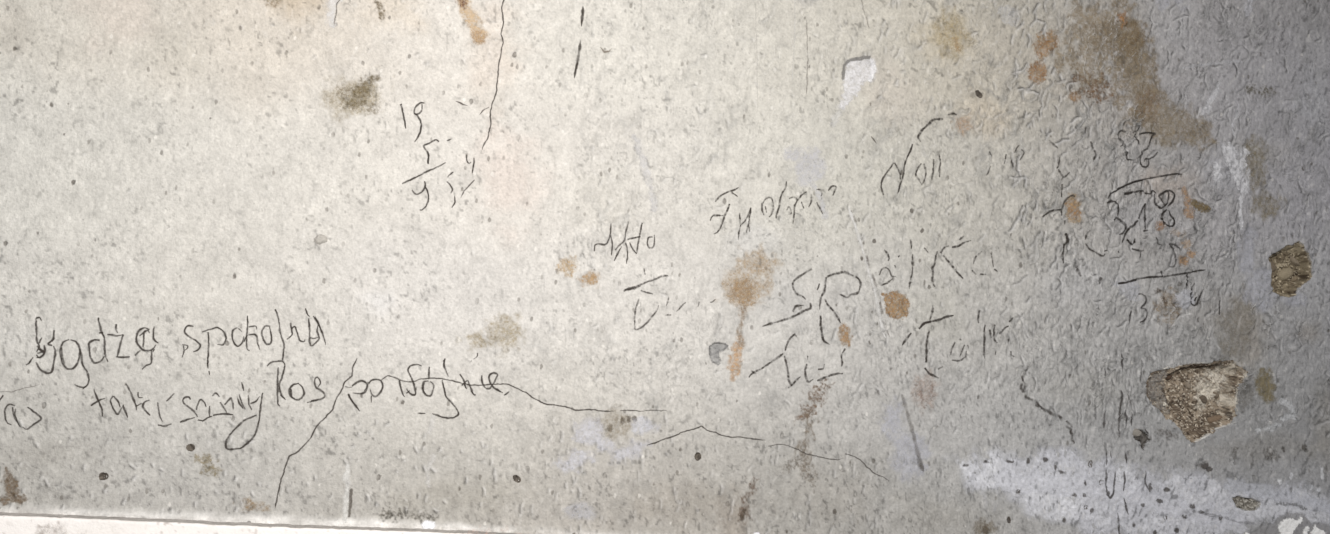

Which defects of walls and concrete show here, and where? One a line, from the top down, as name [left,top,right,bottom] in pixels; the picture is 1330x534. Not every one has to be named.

crack [480,0,504,149]
leakage [1055,0,1215,145]
corrosion [722,252,776,378]
spalling [1269,241,1312,297]
crack [275,359,887,507]
spalling [1146,360,1248,443]